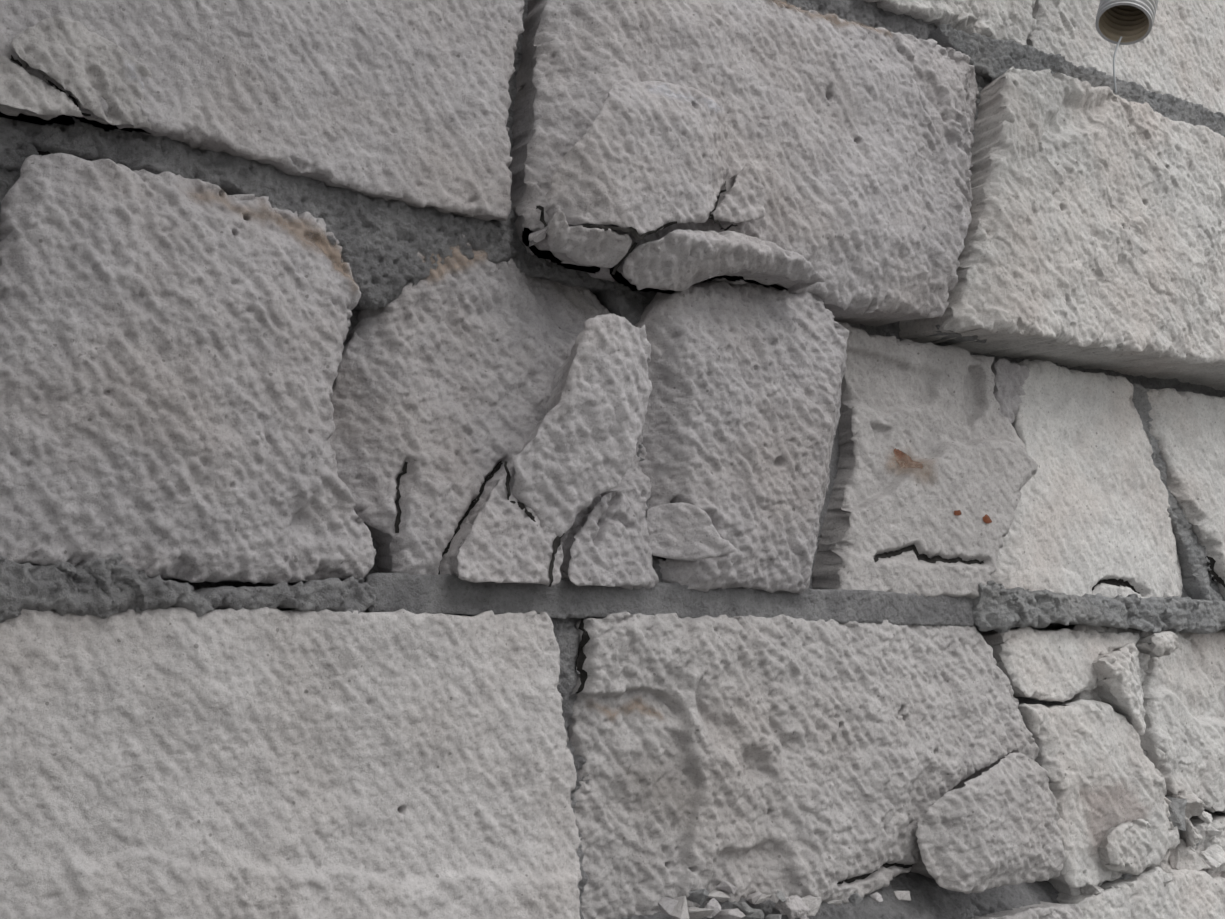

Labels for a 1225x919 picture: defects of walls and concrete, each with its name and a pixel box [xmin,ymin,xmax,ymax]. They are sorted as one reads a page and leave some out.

crack [9,55,91,116]
crack [536,205,548,227]
crack [708,181,738,231]
crack [583,221,677,275]
corrosion [889,448,930,476]
crack [394,461,408,533]
crack [438,461,565,587]
crack [873,544,984,564]
crack [1092,579,1140,594]
crack [1205,556,1225,587]
crack [575,618,590,694]
crack [837,863,914,884]